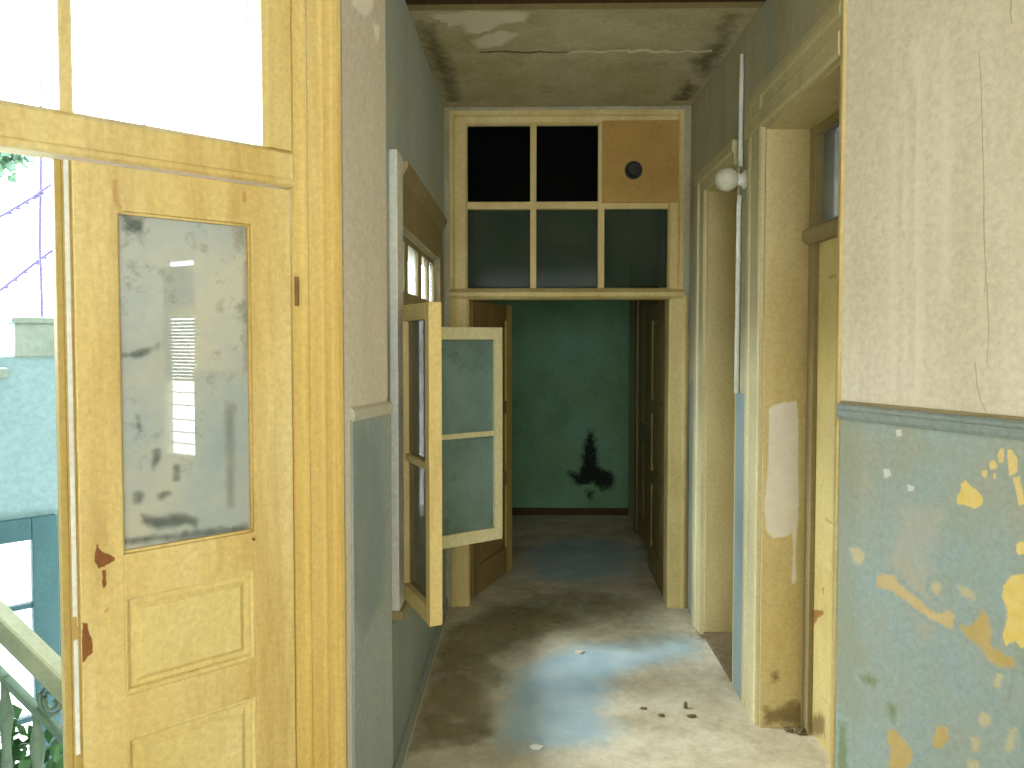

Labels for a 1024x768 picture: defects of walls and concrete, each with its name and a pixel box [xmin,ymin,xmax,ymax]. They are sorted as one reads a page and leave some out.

damp [412,14,472,102]
crack [479,47,712,55]
damp [661,8,757,101]
peeling [952,445,1024,513]
peeling [847,537,1024,698]
peeling [882,718,954,768]